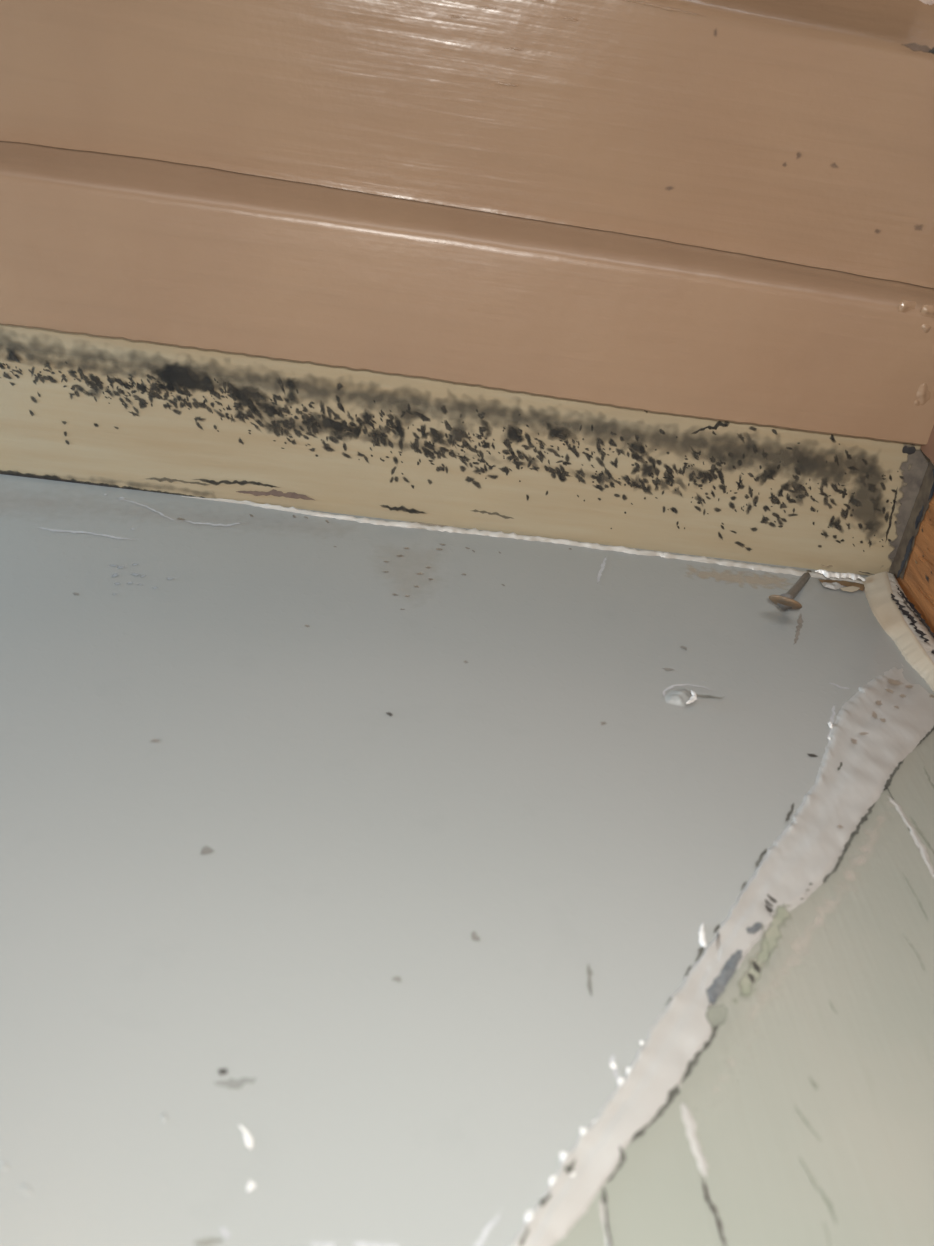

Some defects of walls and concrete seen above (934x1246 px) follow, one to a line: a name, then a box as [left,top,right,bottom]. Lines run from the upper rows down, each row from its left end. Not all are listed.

damp [0,341,934,579]
crack [703,1176,726,1246]